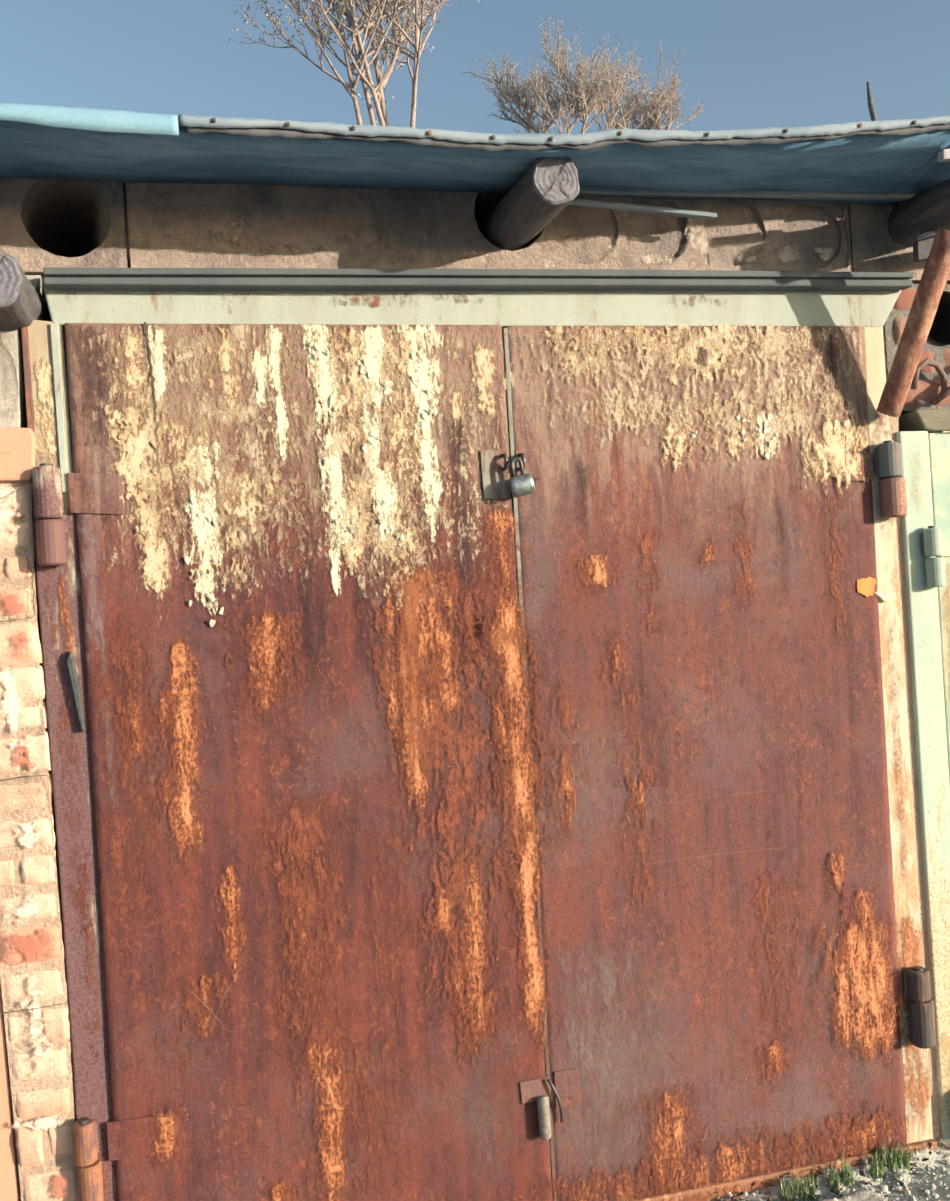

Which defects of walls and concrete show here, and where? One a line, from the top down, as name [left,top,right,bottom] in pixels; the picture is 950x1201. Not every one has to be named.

corrosion [70,619,217,988]
corrosion [223,609,315,719]
corrosion [347,506,586,1067]
peeling [74,323,870,627]
corrosion [574,552,621,596]
corrosion [891,664,906,870]
corrosion [146,1105,188,1170]
corrosion [155,794,406,1201]
corrosion [531,845,930,1201]